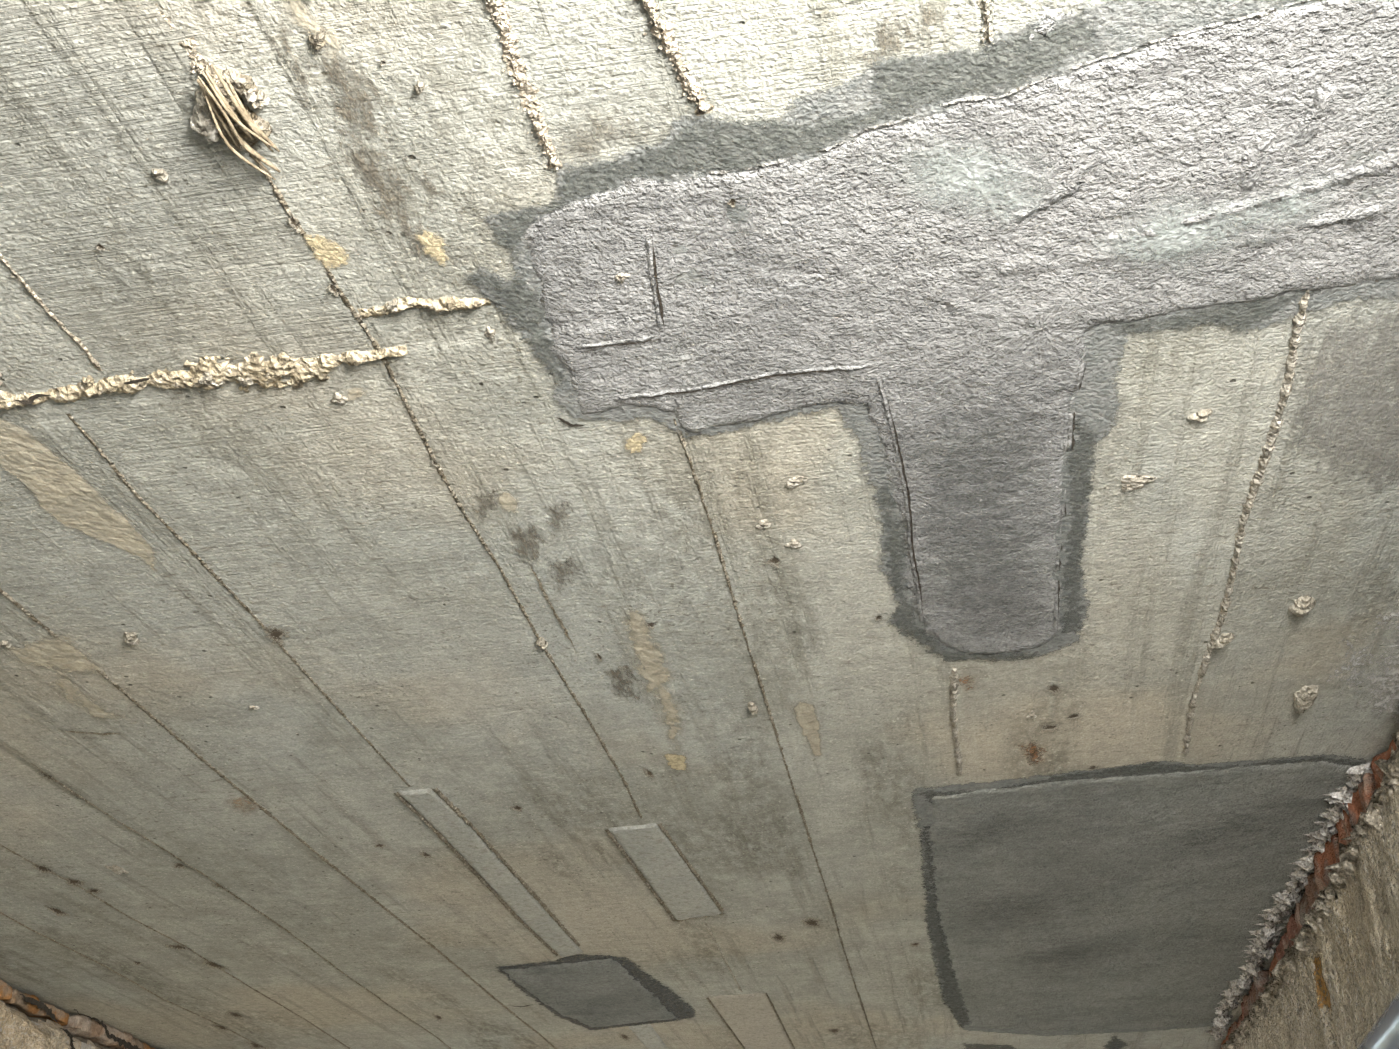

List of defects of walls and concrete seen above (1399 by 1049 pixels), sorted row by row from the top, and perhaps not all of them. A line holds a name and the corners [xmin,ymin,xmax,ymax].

crack [580,237,665,349]
crack [623,367,925,626]
spalling [1026,711,1081,764]